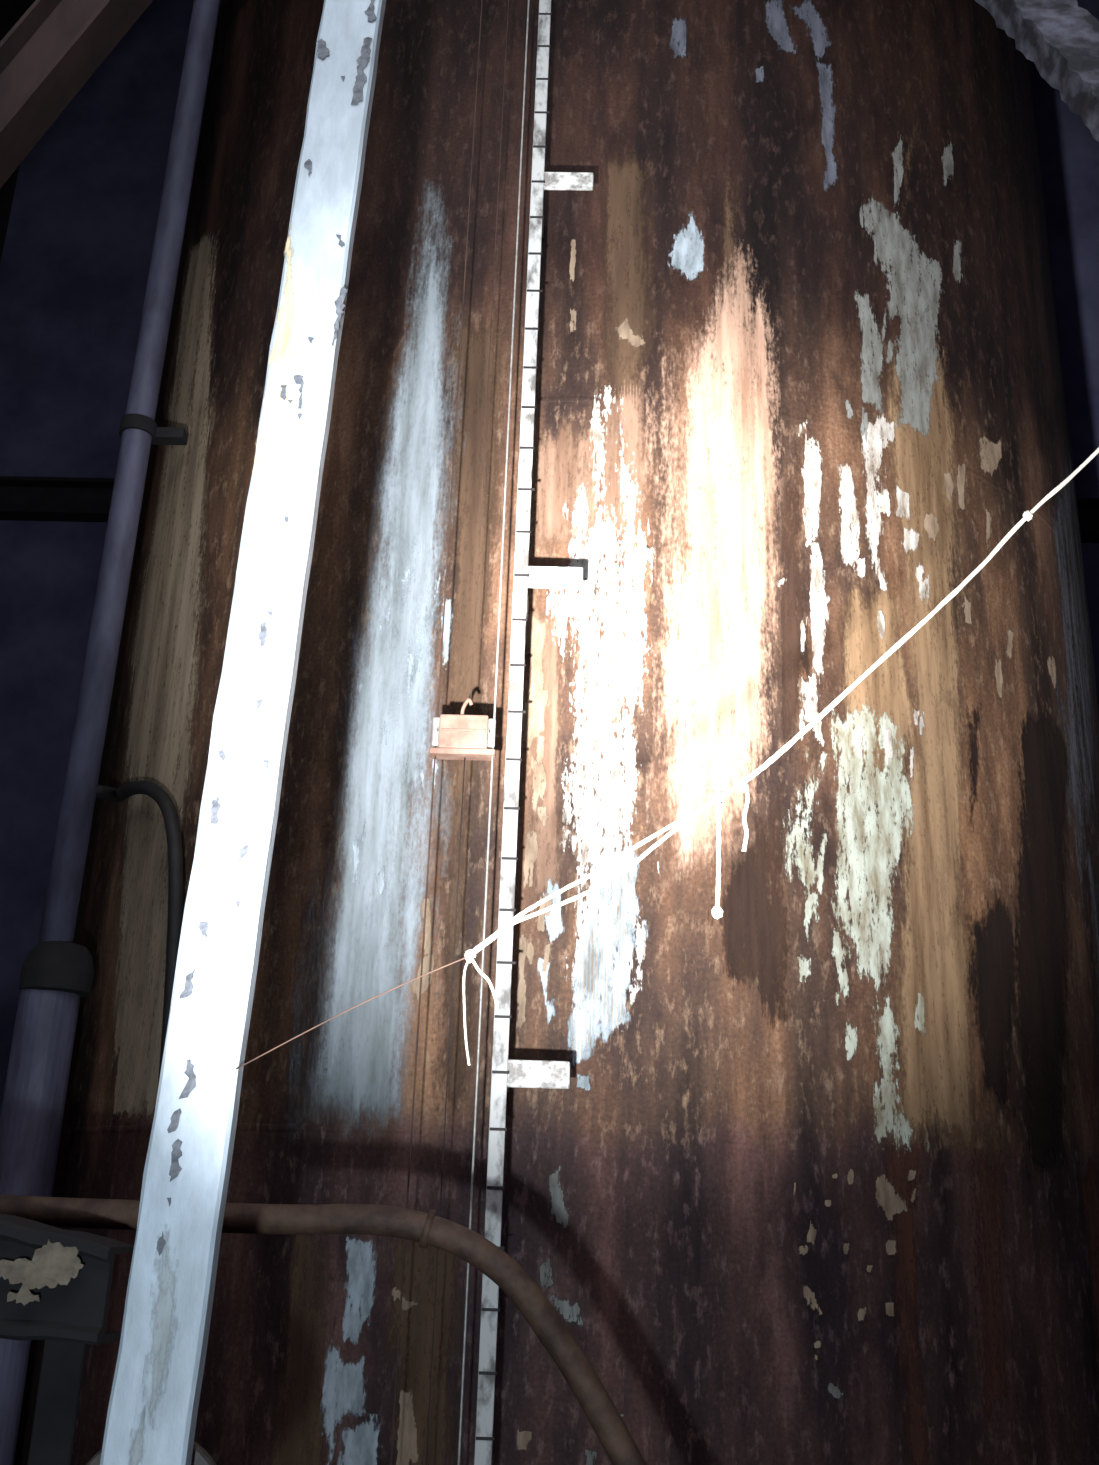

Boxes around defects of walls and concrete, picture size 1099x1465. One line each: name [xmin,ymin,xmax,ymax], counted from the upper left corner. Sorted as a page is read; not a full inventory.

peeling [766,0,838,191]
peeling [669,215,704,280]
rust [522,607,561,899]
peeling [516,385,654,1091]
rust [530,156,781,892]
peeling [783,138,963,1156]
rust [835,347,974,1149]
peeling [944,436,1002,510]
peeling [995,629,1014,698]
peeling [875,1170,916,1221]
peeling [0,1214,134,1465]
peeling [320,1237,419,1465]